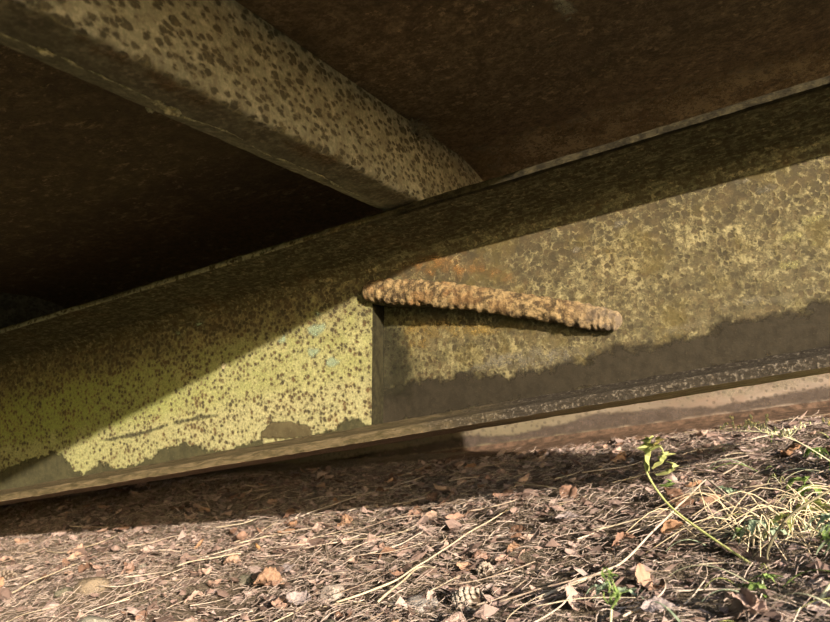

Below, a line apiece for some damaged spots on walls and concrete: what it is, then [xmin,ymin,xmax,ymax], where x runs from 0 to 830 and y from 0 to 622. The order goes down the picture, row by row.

water stain [383,300,830,423]